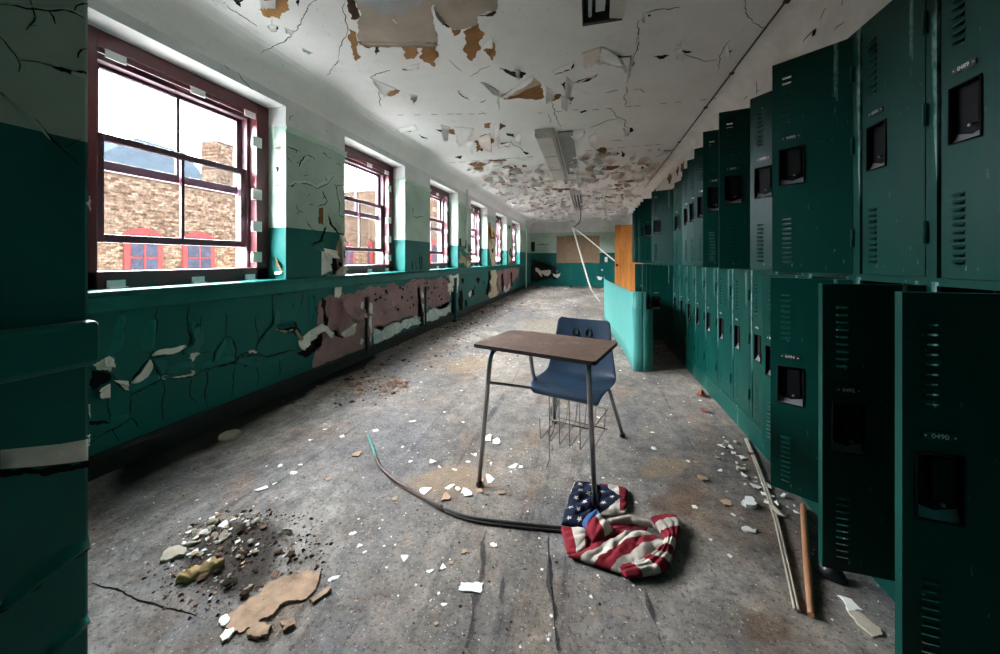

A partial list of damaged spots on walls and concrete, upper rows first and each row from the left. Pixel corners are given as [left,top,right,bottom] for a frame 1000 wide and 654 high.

crack [0,0,87,30]
spalling [347,0,679,112]
crack [0,92,82,166]
crack [287,145,342,232]
peeling [436,108,684,224]
spalling [276,207,519,368]
peeling [89,356,130,399]
peeling [162,352,202,379]
crack [89,292,303,442]
crack [92,582,196,616]